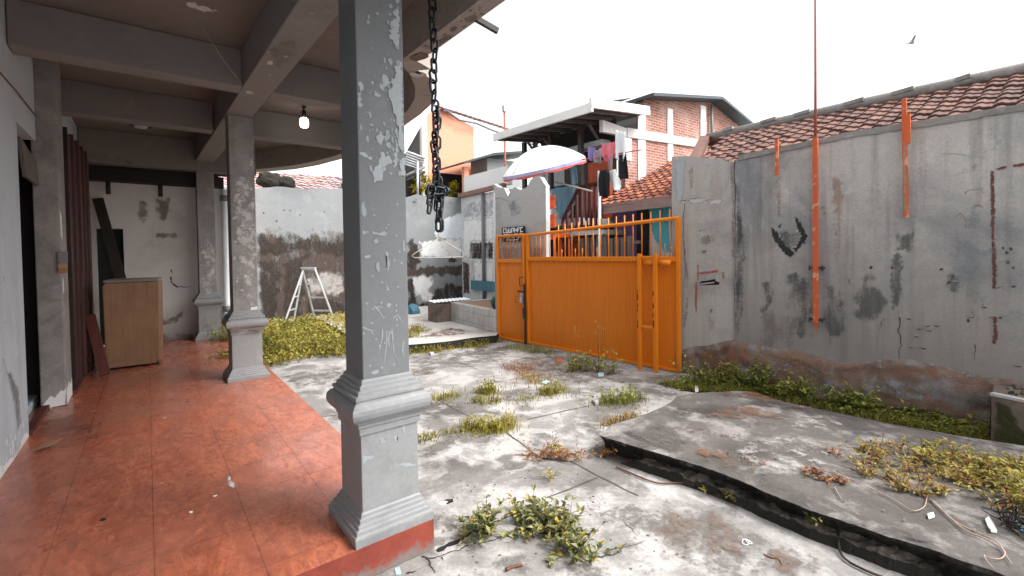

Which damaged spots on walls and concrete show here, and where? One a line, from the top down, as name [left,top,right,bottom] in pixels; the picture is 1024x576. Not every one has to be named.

peeling [232,157,264,310]
damp [257,234,345,320]
peeling [363,224,406,374]
damp [855,232,914,320]
rust [990,163,1024,288]